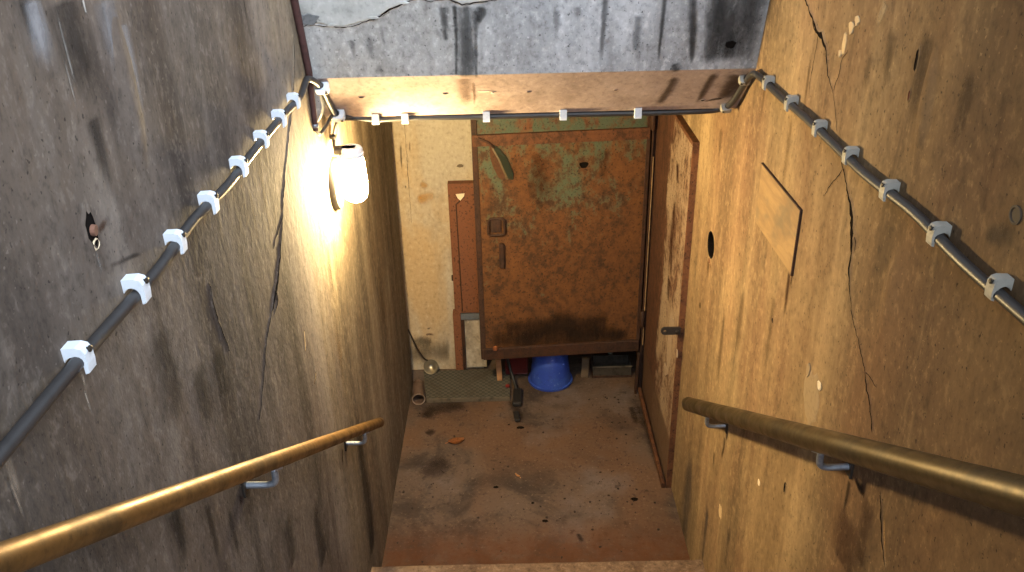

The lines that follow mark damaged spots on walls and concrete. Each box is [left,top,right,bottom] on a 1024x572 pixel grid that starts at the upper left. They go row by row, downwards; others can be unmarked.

flaking render [299,0,409,27]
water stain [441,6,485,98]
water stain [690,0,761,59]
crack [805,0,849,132]
crack [259,0,499,420]
crack [824,159,877,434]